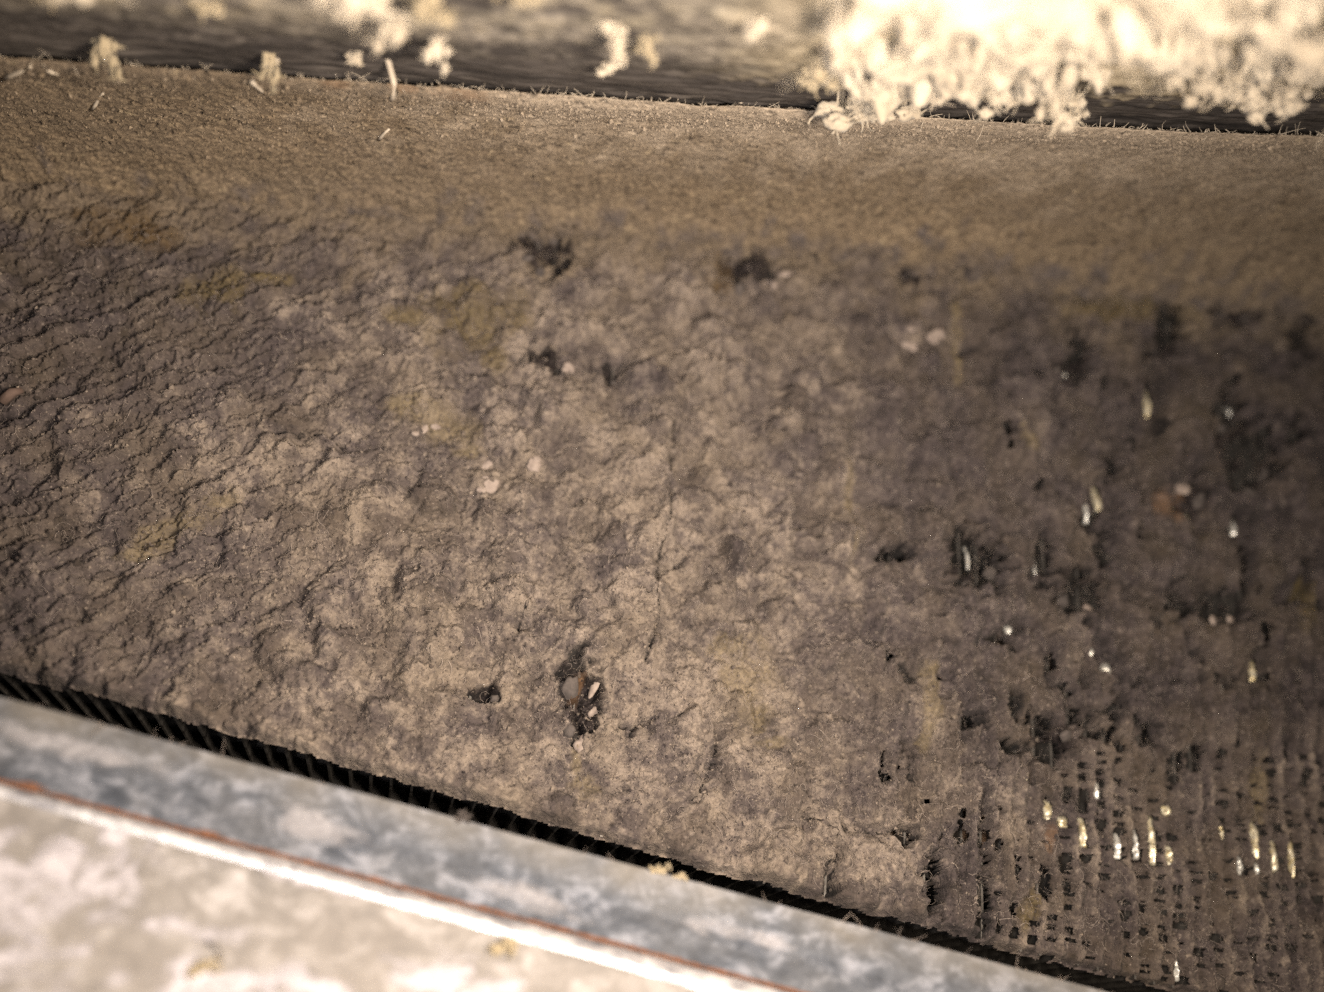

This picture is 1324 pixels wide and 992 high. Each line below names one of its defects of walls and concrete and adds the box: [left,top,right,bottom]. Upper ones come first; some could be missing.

crack [644,420,685,660]
crack [804,817,891,888]